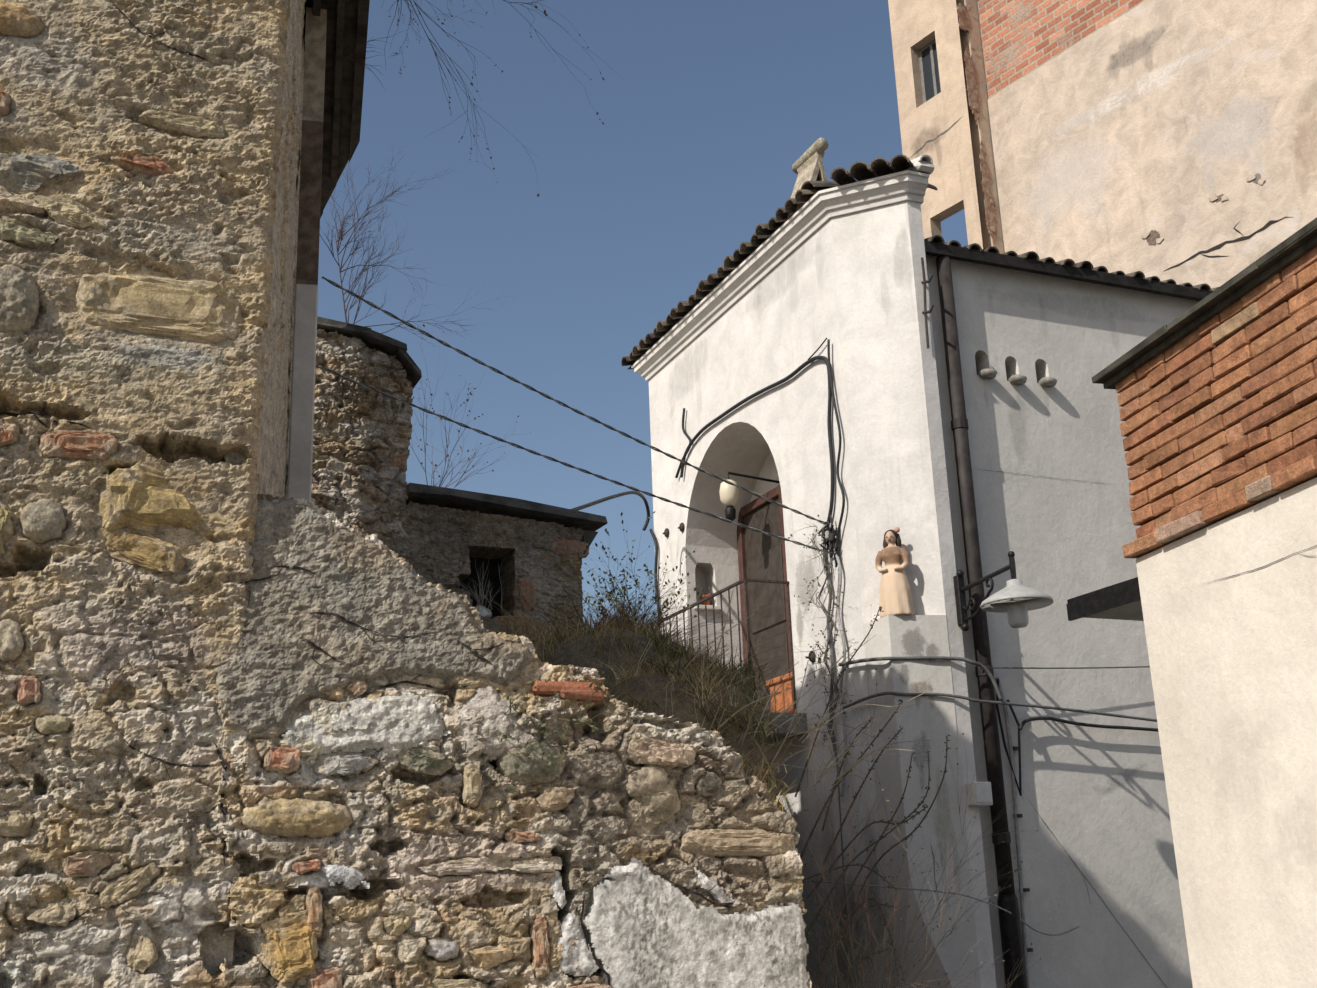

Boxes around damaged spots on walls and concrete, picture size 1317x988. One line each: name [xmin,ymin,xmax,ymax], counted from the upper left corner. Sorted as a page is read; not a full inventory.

crack [1164,217,1288,271]
crack [1195,545,1317,587]